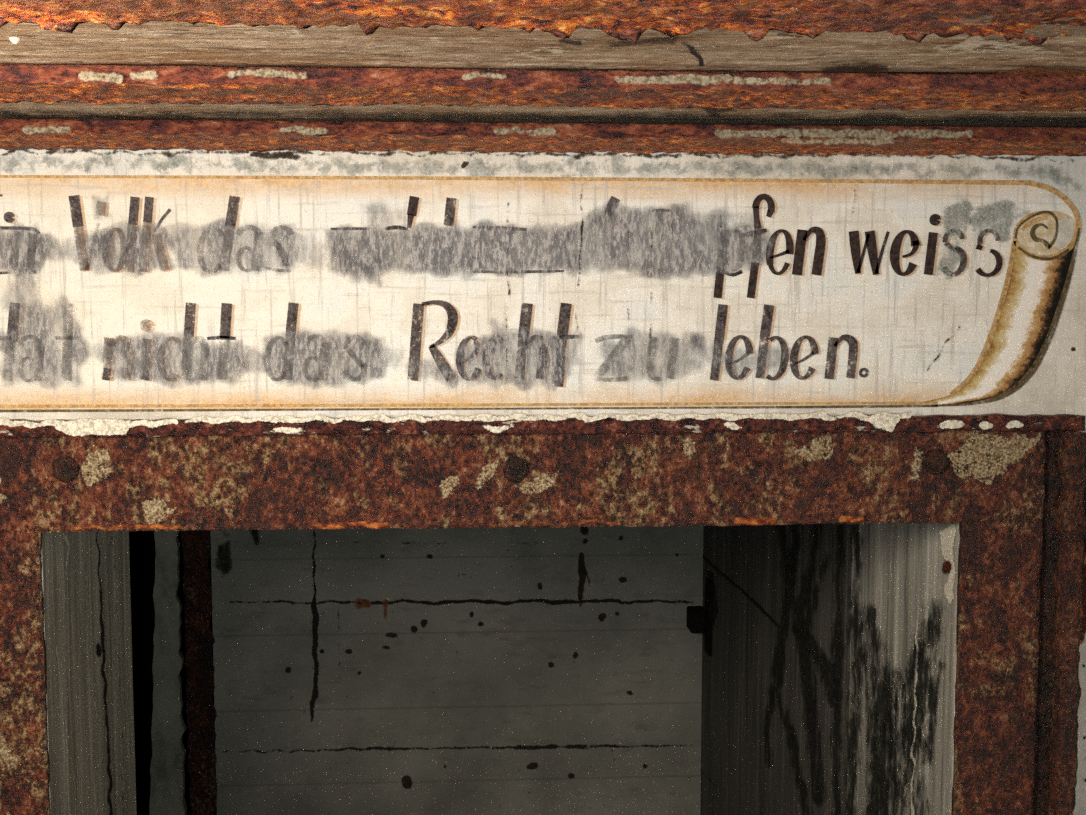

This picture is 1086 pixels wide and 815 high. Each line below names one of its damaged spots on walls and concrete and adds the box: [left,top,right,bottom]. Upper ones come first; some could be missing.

rust [822,65,889,74]
rust [3,149,325,160]
rust [947,154,1039,162]
rust [316,521,388,529]
crack [230,531,785,722]
water stain [776,524,932,815]
water stain [923,661,945,762]
crack [223,744,685,753]